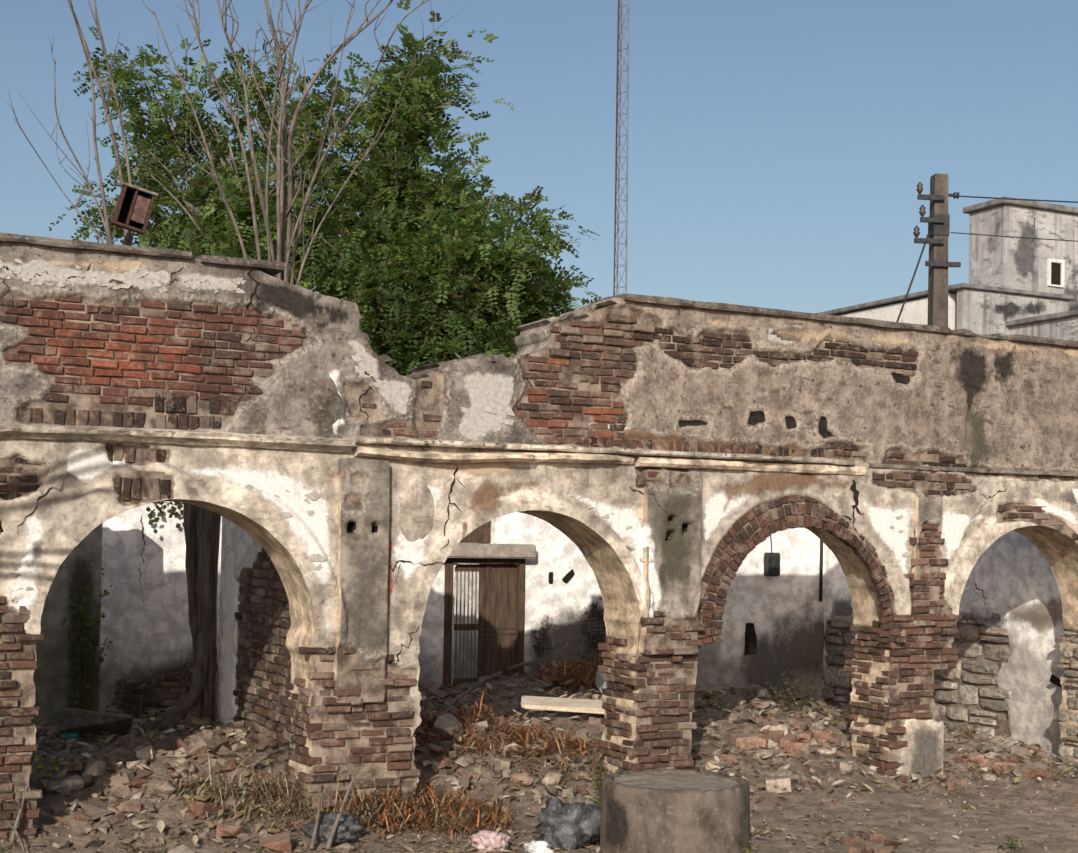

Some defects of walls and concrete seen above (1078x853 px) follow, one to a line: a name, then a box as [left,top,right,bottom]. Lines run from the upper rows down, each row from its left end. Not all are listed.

water stain [1014,223,1037,277]
spalling [0,258,308,430]
spalling [458,314,918,449]
water stain [953,347,1015,467]
crack [17,481,63,528]
peeling [191,467,332,584]
peeling [394,531,430,580]
crack [388,465,465,586]
crack [843,480,862,531]
spalling [0,516,45,839]
spalling [223,548,424,817]
spalling [570,490,1012,776]